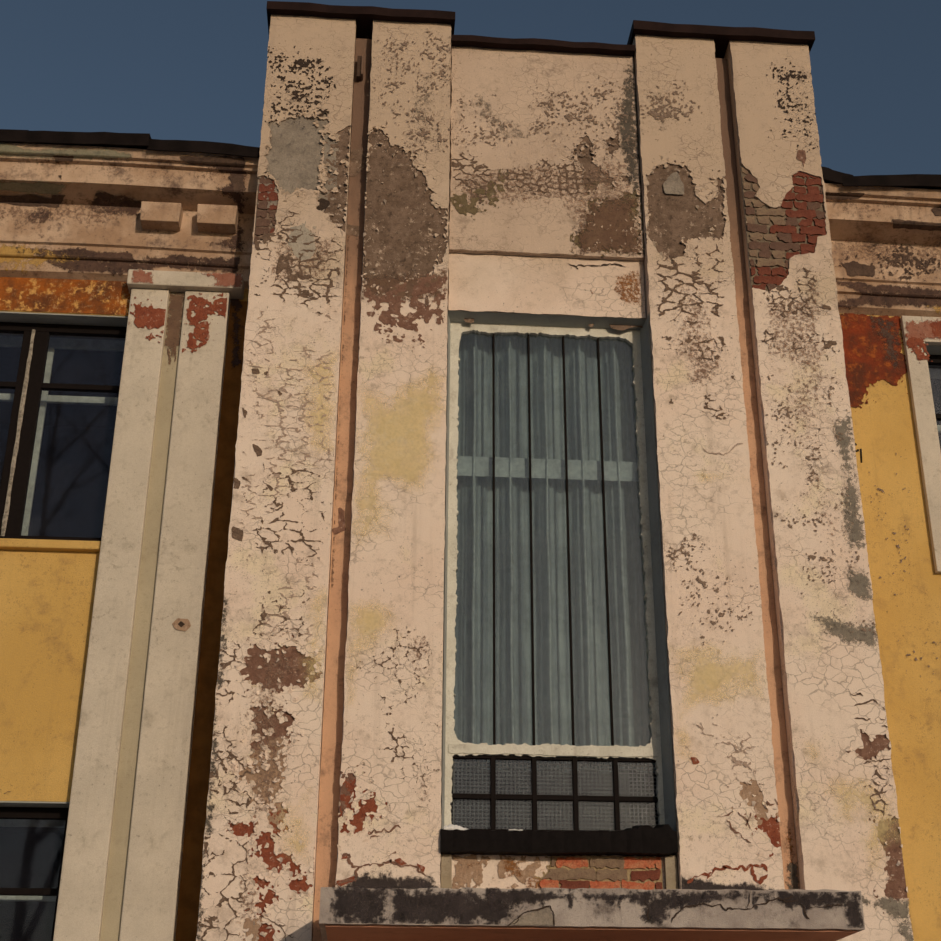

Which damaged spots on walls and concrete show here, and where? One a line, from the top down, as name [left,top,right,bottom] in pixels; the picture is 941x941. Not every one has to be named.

leakage [0,143,131,159]
flaking render [254,107,508,348]
flaking render [561,129,730,264]
crack [754,258,840,369]
leakage [832,415,867,553]
peeling [766,313,941,594]
crack [198,197,344,941]
leakage [810,612,878,646]
peeling [223,631,325,941]
crack [672,703,841,921]
crack [848,689,896,820]
leakage [330,862,914,941]